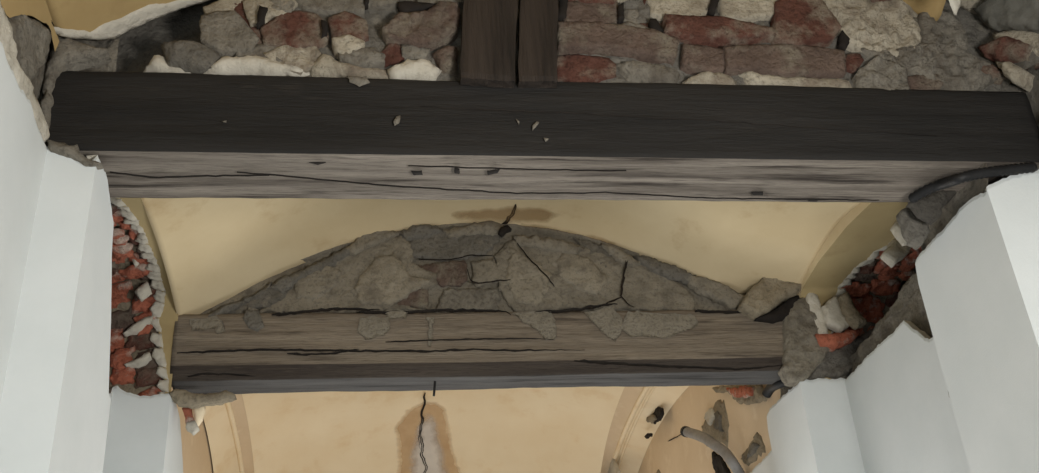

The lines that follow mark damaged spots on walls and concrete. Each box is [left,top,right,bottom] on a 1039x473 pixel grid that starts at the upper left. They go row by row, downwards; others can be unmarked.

spalling [0,0,210,170]
spalling [949,0,1039,127]
spalling [109,197,237,436]
spalling [208,221,503,317]
crack [272,204,633,316]
spalling [600,243,745,310]
crack [695,307,740,315]
spalling [805,220,922,352]
crack [418,393,428,473]
spalling [644,407,664,439]
spalling [701,385,768,473]